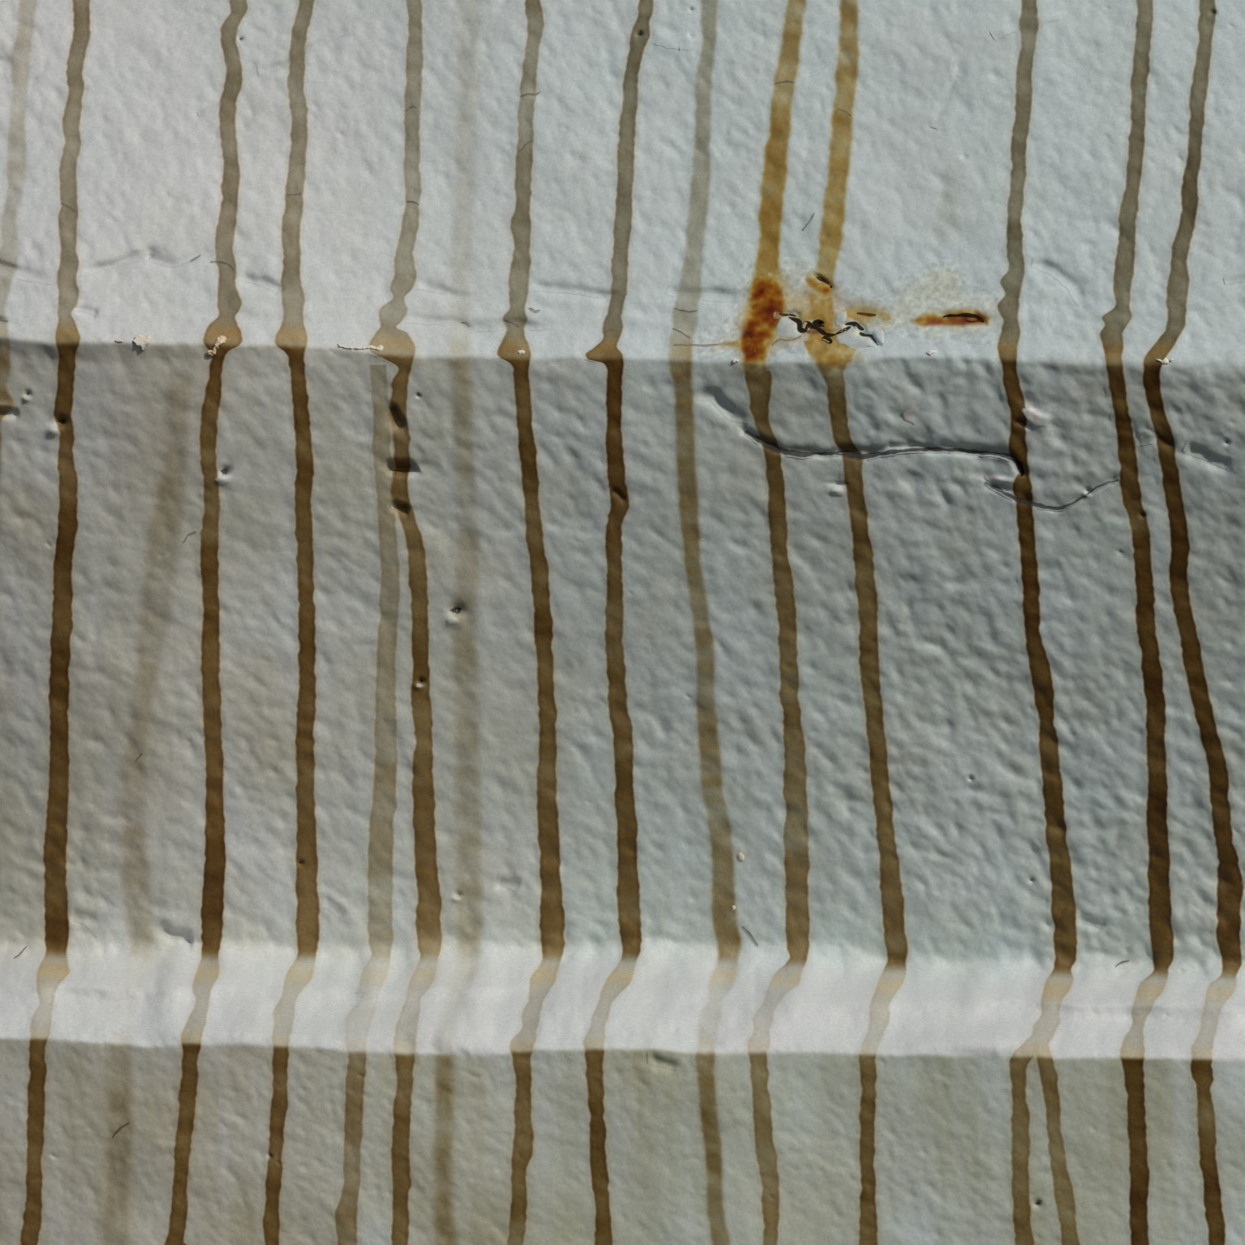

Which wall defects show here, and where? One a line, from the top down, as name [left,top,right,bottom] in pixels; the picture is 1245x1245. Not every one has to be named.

leakage [0,0,41,540]
leakage [16,0,95,1245]
leakage [97,0,252,1245]
leakage [258,0,325,1245]
leakage [330,0,489,1245]
leakage [493,0,570,1245]
leakage [579,0,658,1245]
leakage [664,0,745,1245]
corrosion [695,0,1000,1245]
crack [744,429,1119,511]
leakage [993,0,1085,1245]
leakage [1095,0,1245,1245]